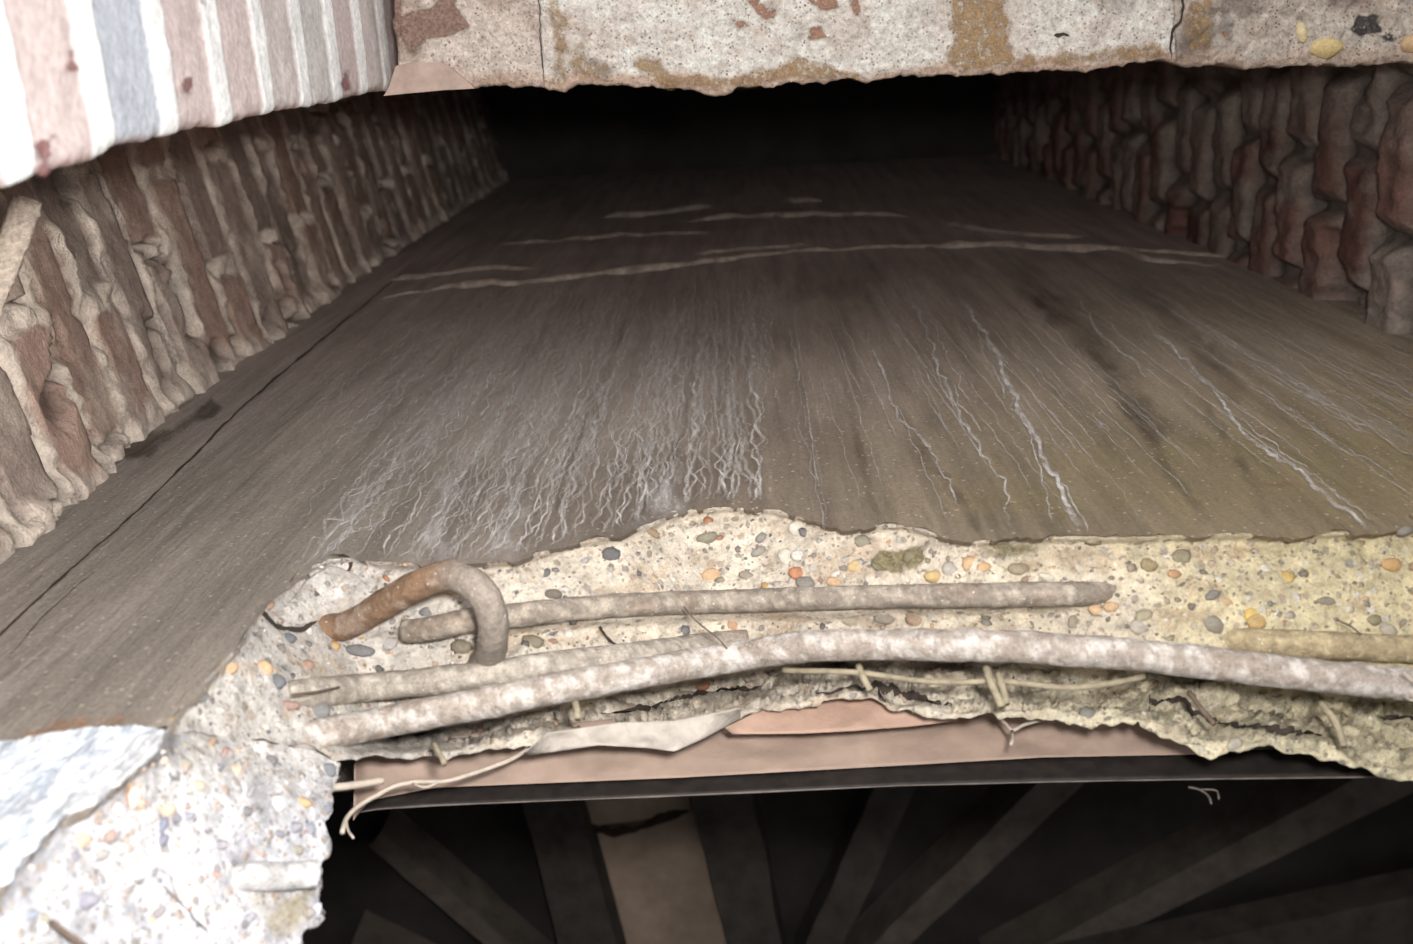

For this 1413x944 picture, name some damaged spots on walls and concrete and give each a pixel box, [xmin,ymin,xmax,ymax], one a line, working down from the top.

crack [1169,0,1185,60]
leakage [309,277,776,559]
crack [0,196,1225,657]
leakage [912,301,987,458]
leakage [965,304,1077,514]
leakage [1157,336,1365,522]
spalling [0,507,1413,944]